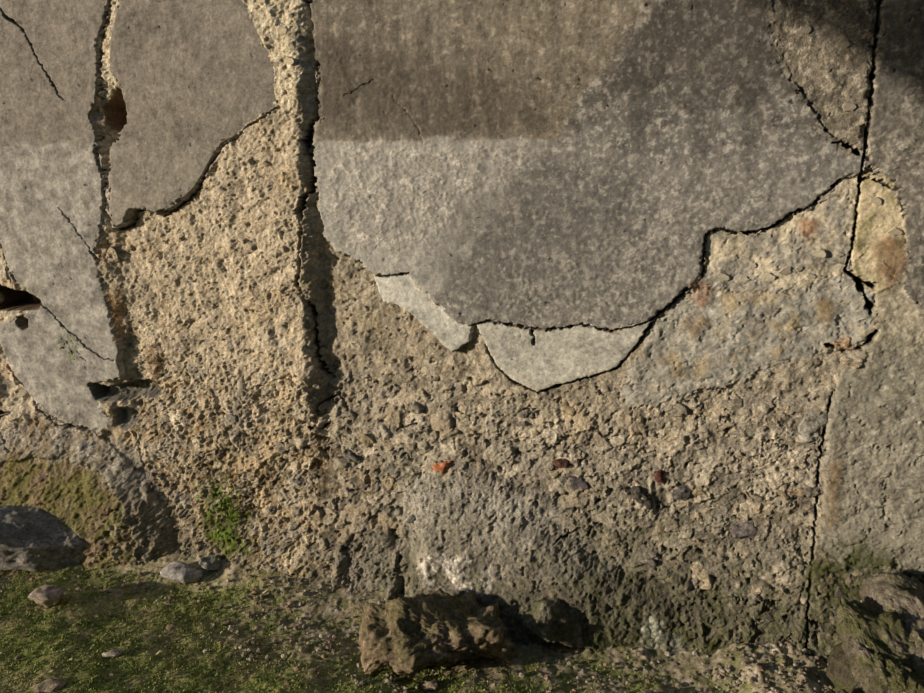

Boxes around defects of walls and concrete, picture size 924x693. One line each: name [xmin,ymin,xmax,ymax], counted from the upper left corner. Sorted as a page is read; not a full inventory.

spalling [0,240,28,321]
spalling [0,344,40,421]
spalling [90,0,326,583]
crack [313,318,333,374]
spalling [311,191,924,662]
spalling [685,0,909,302]
crack [805,502,818,648]
crack [825,0,892,352]